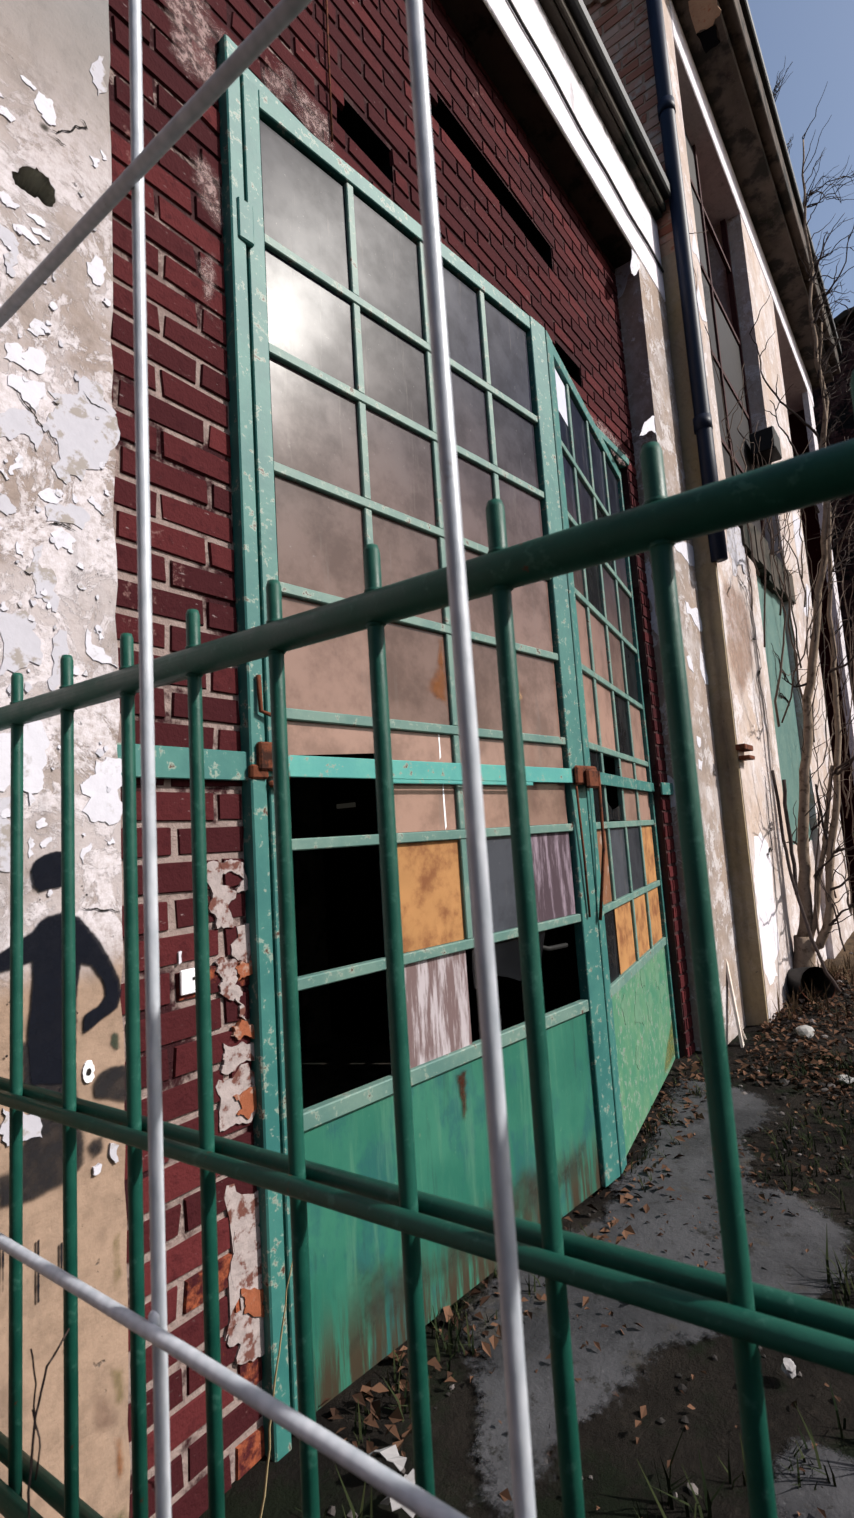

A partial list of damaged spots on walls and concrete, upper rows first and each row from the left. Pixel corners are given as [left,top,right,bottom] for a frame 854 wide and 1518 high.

peeling [89,56,107,95]
peeling [0,93,15,123]
peeling [20,75,56,126]
peeling [89,150,107,169]
peeling [0,166,55,278]
peeling [86,255,111,307]
peeling [0,273,120,696]
spalling [235,961,253,981]
spalling [231,1019,255,1040]
spalling [233,1086,257,1119]
spalling [240,1287,265,1317]